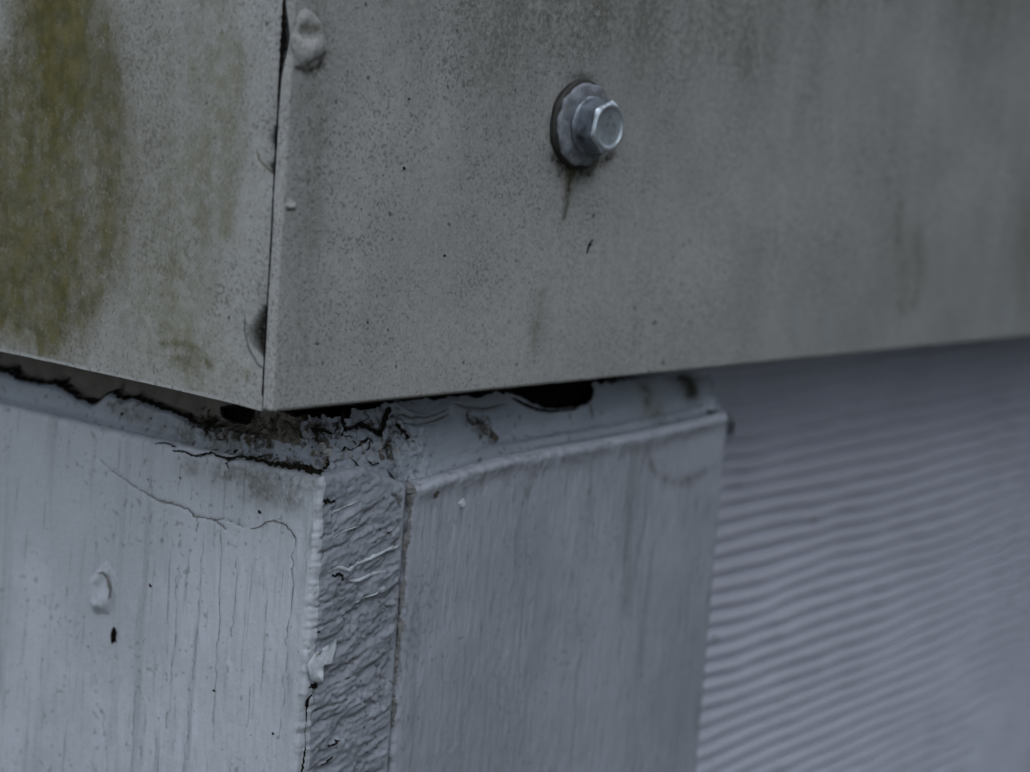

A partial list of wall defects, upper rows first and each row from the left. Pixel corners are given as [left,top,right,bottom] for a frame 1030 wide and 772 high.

crack [100,460,313,772]